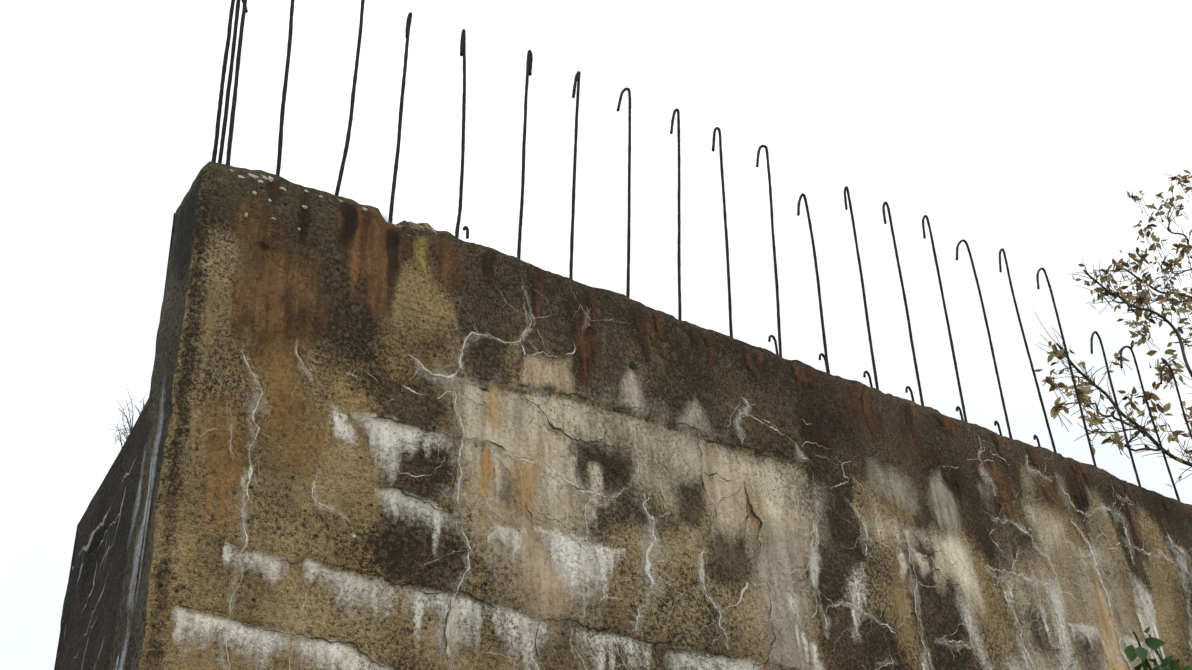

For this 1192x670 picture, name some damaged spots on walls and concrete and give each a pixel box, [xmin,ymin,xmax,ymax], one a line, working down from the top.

rust [232,205,329,355]
rust [339,201,405,312]
rust [483,250,497,281]
crack [64,459,136,670]
damp [173,607,391,670]
crack [201,339,366,670]
damp [332,410,445,470]
damp [462,356,822,670]
crack [389,282,1192,670]
damp [871,468,993,670]
rust [936,411,956,436]
damp [1041,581,1165,670]